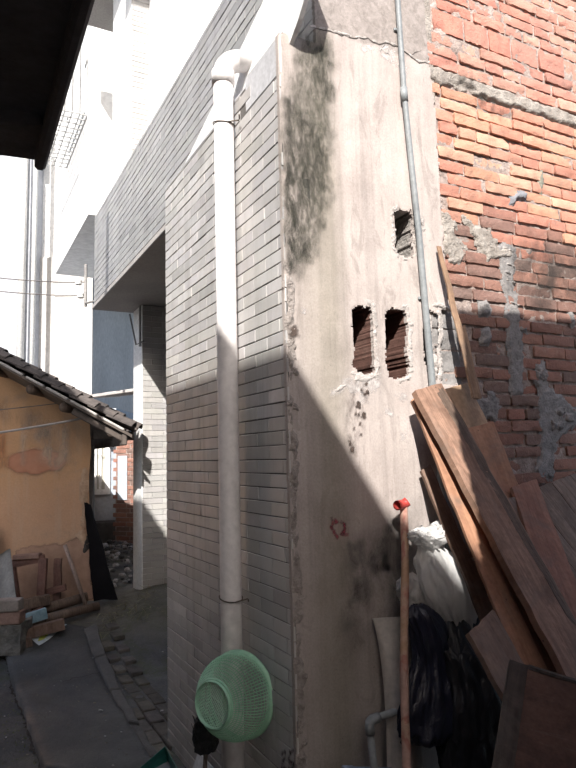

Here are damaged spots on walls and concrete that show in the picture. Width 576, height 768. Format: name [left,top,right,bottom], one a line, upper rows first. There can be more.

damp [286,40,334,268]
crack [310,24,430,64]
spalling [390,205,426,261]
spalling [282,262,308,768]